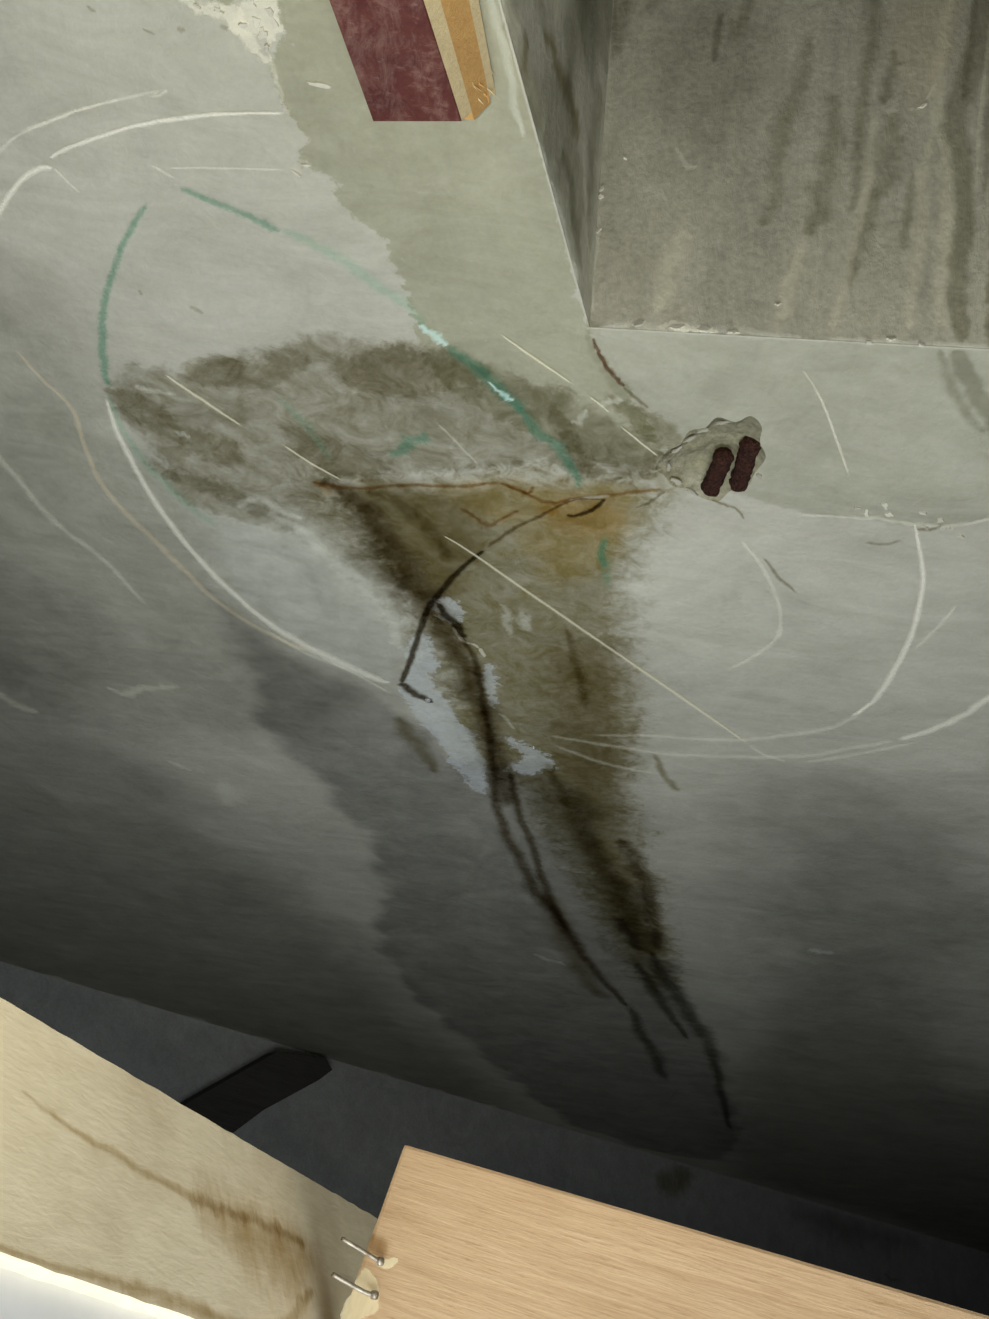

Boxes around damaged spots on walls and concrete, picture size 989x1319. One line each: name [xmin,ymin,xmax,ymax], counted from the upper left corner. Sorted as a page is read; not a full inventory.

peeling [307,80,332,89]
spalling [655,416,766,502]
corrosion [567,499,605,517]
crack [399,551,483,703]
leakage [326,484,624,1003]